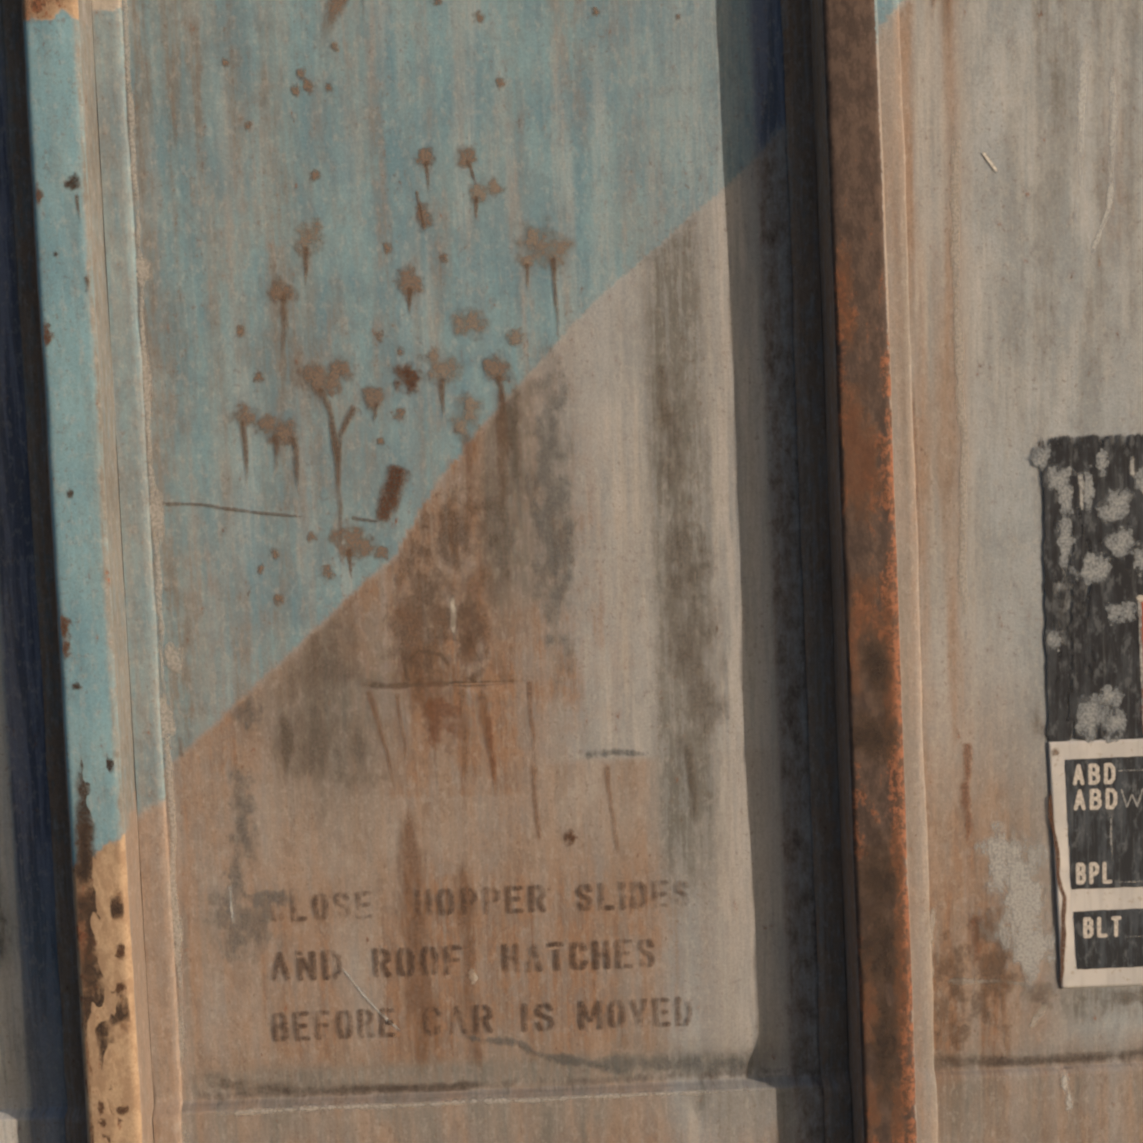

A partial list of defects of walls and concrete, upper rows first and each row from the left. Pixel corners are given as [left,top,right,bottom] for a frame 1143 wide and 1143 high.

corrosion [395,349,455,408]
corrosion [235,404,299,480]
corrosion [299,360,384,486]
corrosion [377,465,409,521]
peeling [1030,444,1143,588]
corrosion [330,528,388,572]
peeling [1105,595,1143,626]
peeling [1045,630,1062,652]
peeling [1075,684,1127,743]
corrosion [76,761,129,1071]
corrosion [860,829,908,1136]
corrosion [98,1102,129,1143]